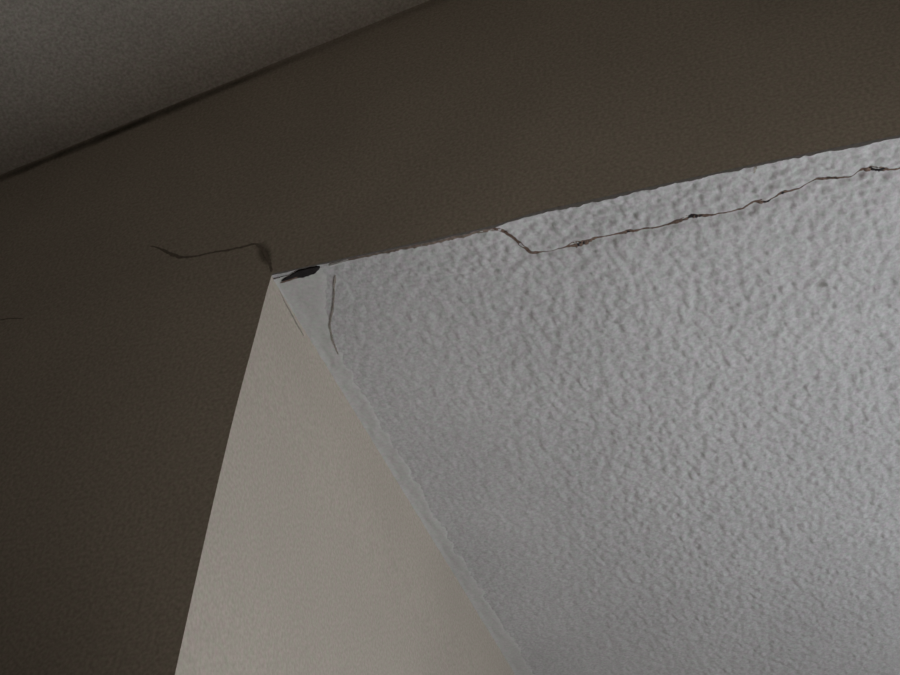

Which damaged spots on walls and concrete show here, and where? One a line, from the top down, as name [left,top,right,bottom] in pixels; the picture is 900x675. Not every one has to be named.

crack [150,243,304,336]
crack [329,165,900,355]